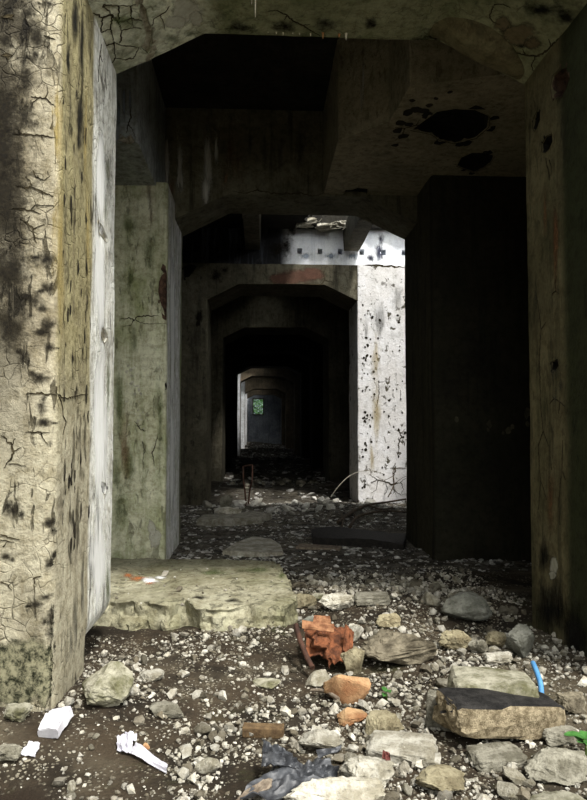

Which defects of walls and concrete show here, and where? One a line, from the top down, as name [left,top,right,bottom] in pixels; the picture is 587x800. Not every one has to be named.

crack [93,3,169,82]
water stain [0,70,31,230]
crack [14,130,55,140]
crack [31,87,55,106]
spalling [391,97,500,175]
spalling [532,109,552,153]
crack [12,170,53,243]
water stain [0,258,22,283]
water stain [21,224,62,335]
water stain [1,315,48,382]
crack [1,386,88,468]
crack [369,429,406,494]